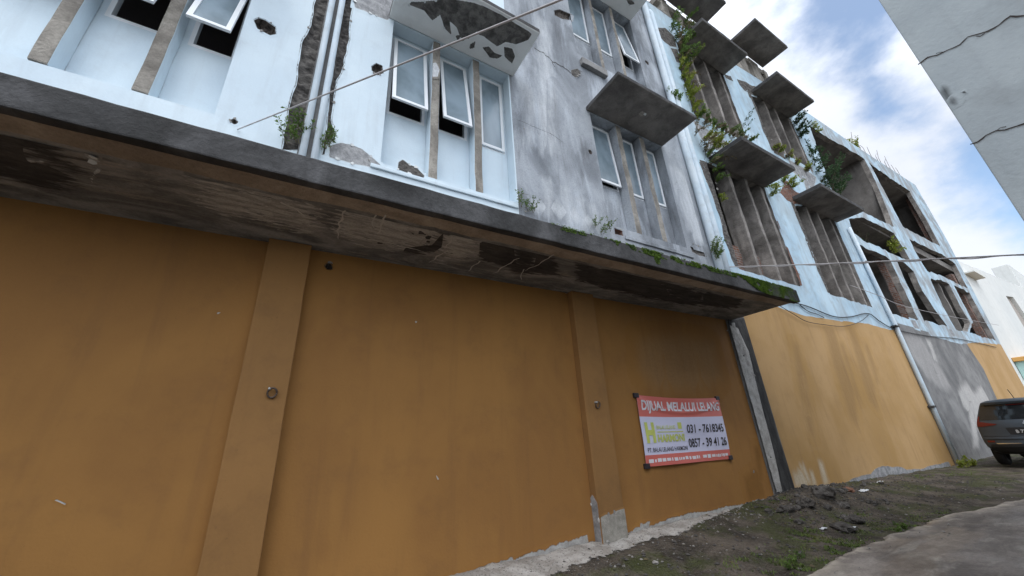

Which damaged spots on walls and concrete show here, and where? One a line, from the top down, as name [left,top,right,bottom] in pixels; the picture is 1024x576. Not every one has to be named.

spalling [251,16,279,37]
crack [918,15,1024,65]
flaking render [278,0,328,154]
peeling [319,0,533,178]
crack [970,123,1024,145]
water stain [0,134,148,211]
peeling [316,204,496,272]